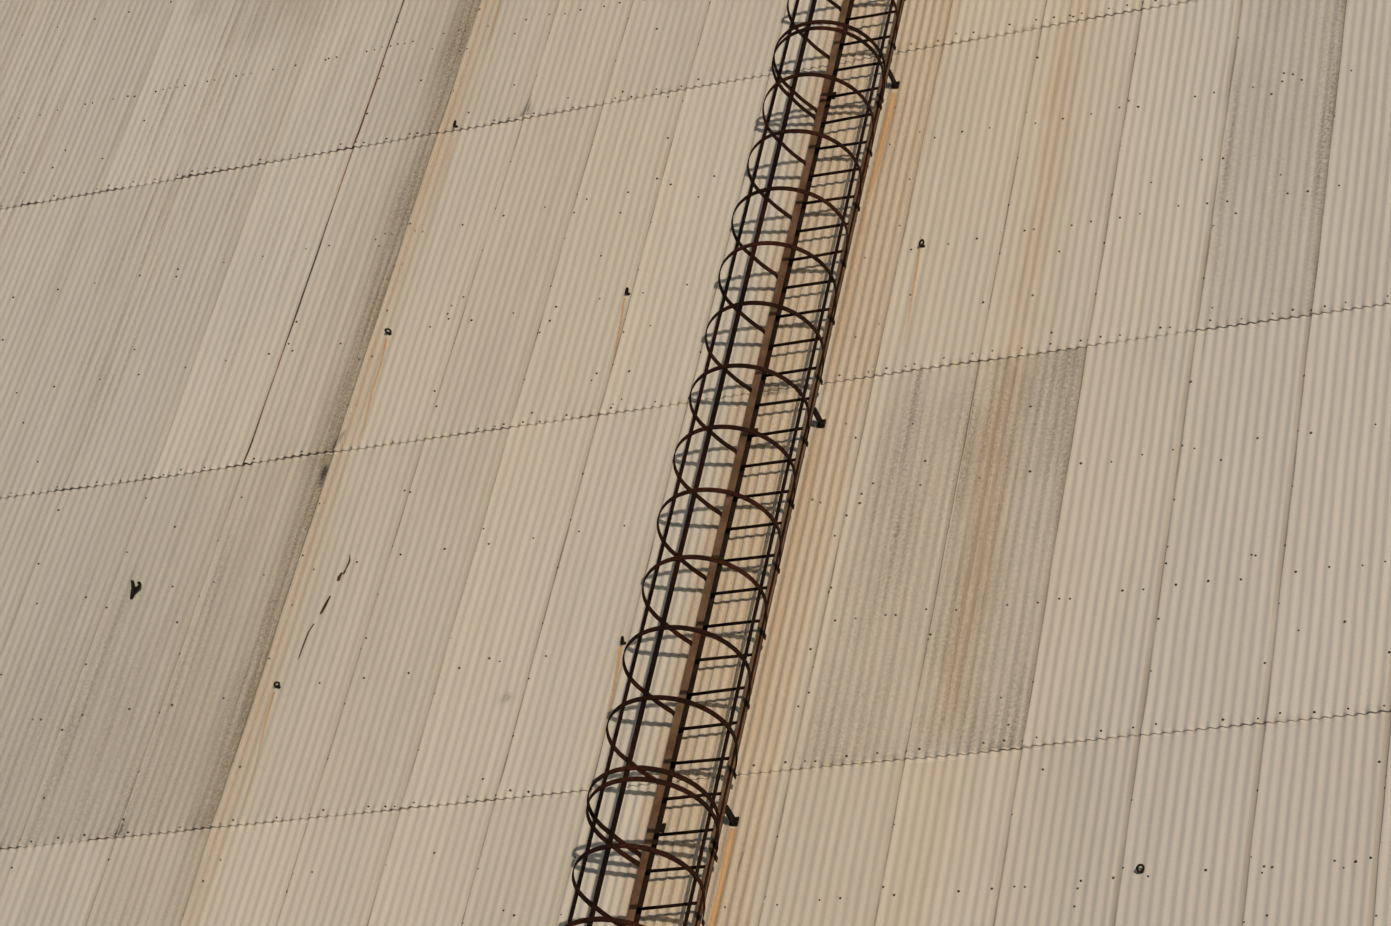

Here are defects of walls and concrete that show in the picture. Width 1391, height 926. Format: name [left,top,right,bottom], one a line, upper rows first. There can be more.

rust [868,93,910,197]
rust [644,152,836,926]
rust [777,412,848,600]